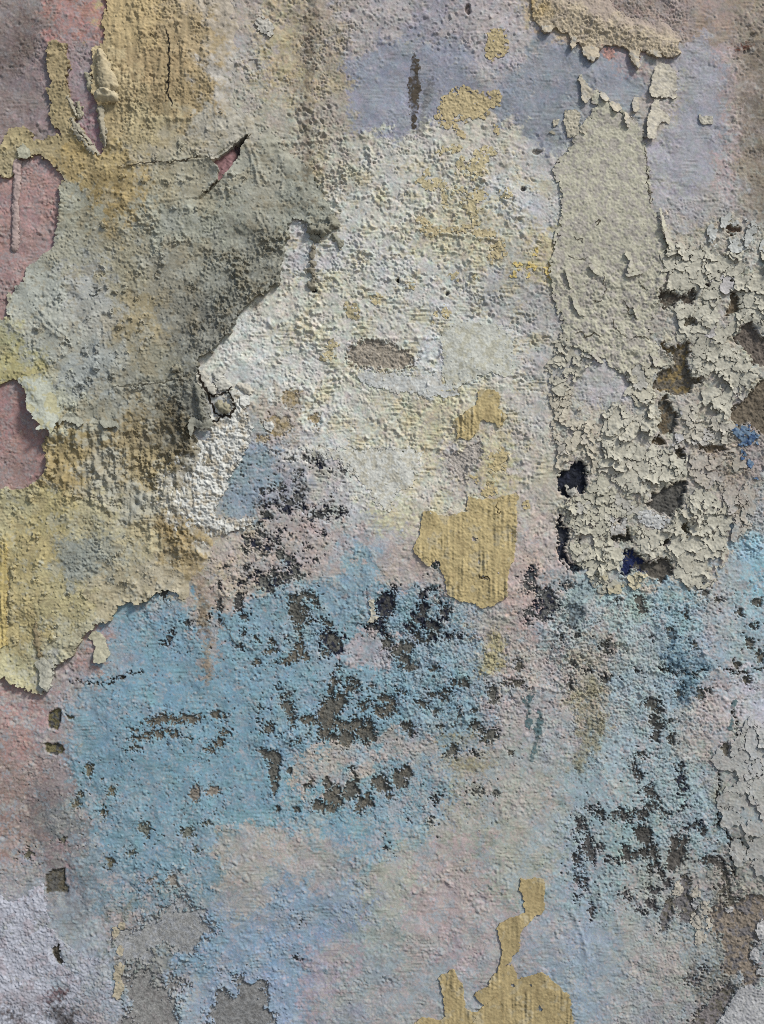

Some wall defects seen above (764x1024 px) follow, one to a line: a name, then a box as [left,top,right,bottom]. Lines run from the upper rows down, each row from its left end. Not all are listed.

crack [120,155,222,193]
peeling [516,0,764,641]
crack [113,370,236,429]
peeling [0,0,525,816]
peeling [734,597,764,663]
peeling [566,659,623,690]
peeling [667,663,711,702]
peeling [639,696,675,745]
peeling [561,715,764,1024]